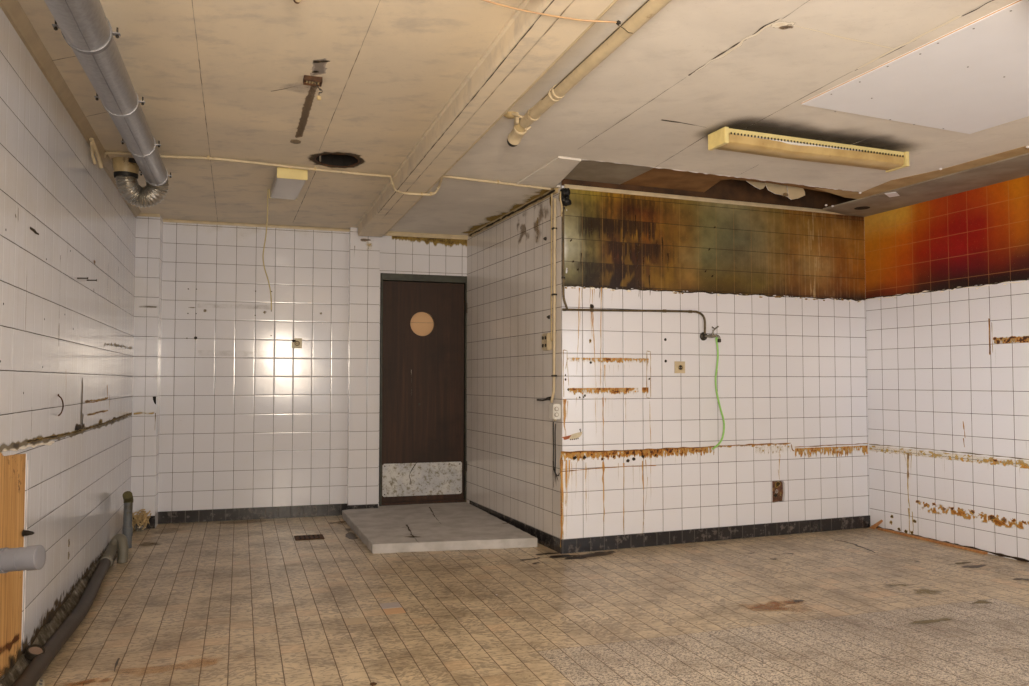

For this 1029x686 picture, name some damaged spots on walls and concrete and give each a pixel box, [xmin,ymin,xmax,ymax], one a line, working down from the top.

peeling [797,146,1029,199]
rust [563,287,651,428]
rust [988,318,1029,355]
rust [560,429,1029,547]